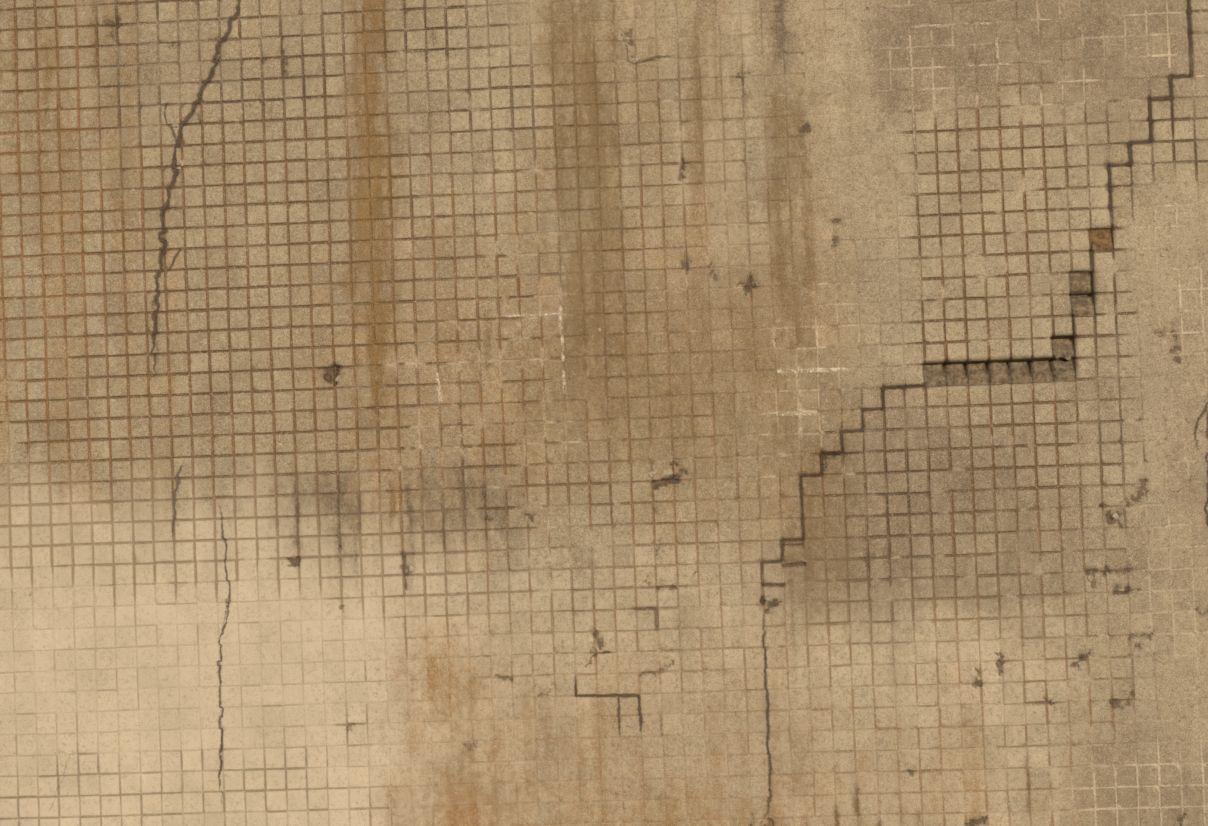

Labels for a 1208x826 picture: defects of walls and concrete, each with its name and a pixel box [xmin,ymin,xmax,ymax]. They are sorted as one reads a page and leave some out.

crack [1108,0,1193,221]
crack [130,0,240,374]
peeling [1069,271,1095,317]
peeling [1088,228,1114,253]
spalling [323,365,342,386]
peeling [923,336,1076,387]
spalling [648,461,688,490]
crack [761,384,924,585]
crack [1195,402,1208,525]
spalling [1085,566,1140,594]
crack [217,513,231,789]
crack [750,621,772,825]